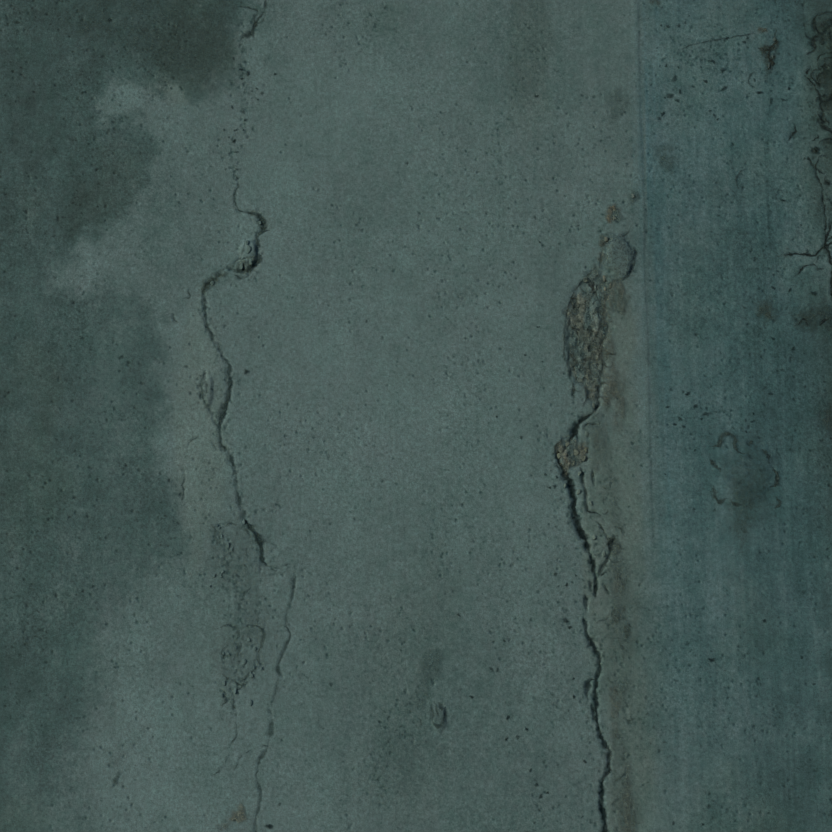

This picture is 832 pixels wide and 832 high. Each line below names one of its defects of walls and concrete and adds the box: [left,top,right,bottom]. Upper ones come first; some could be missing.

crack [187,177,296,695]
crack [255,719,273,832]
crack [557,403,615,832]
spalling [563,268,611,409]